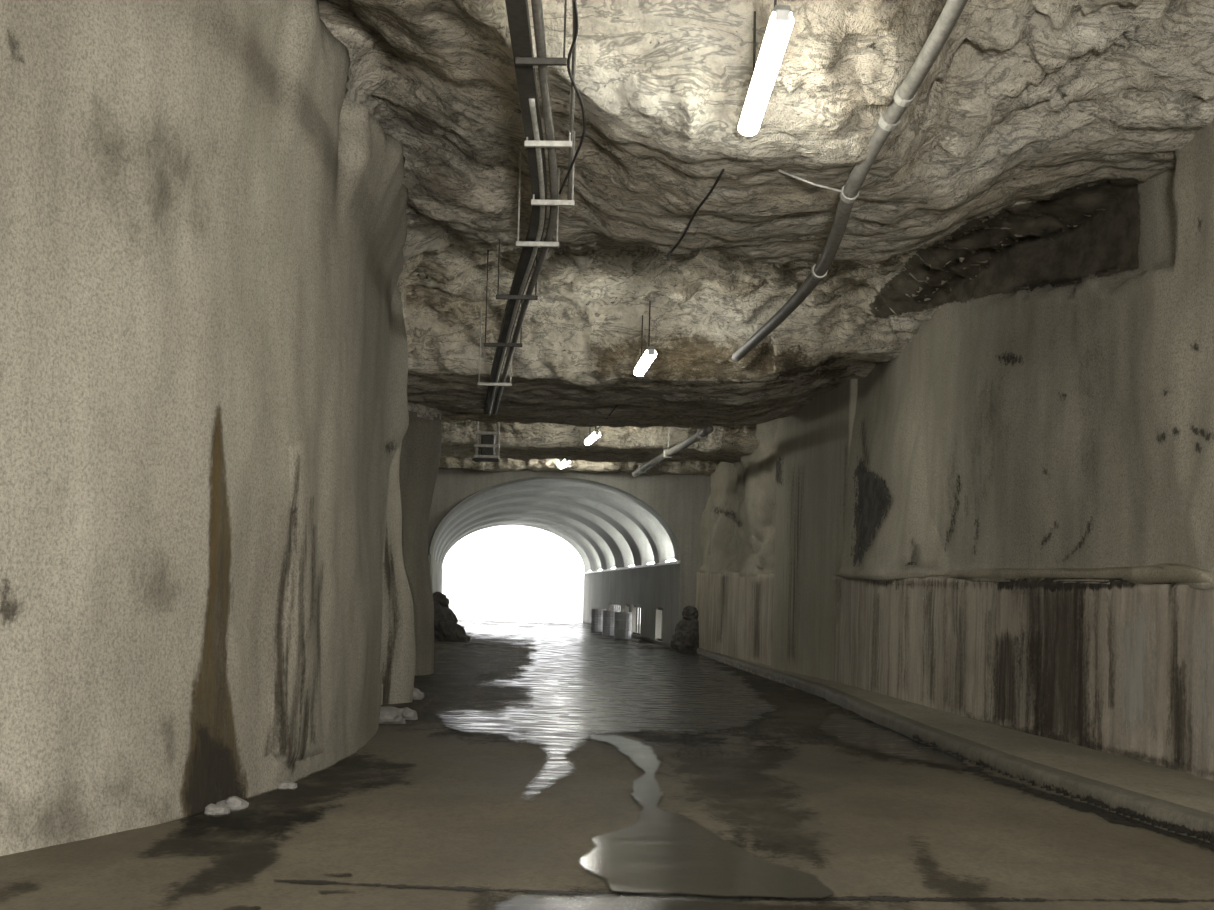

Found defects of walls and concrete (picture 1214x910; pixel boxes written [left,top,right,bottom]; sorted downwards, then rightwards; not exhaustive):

leakage [141,406,412,900]
leakage [382,527,533,739]
leakage [627,649,1214,852]
leakage [959,578,1136,749]